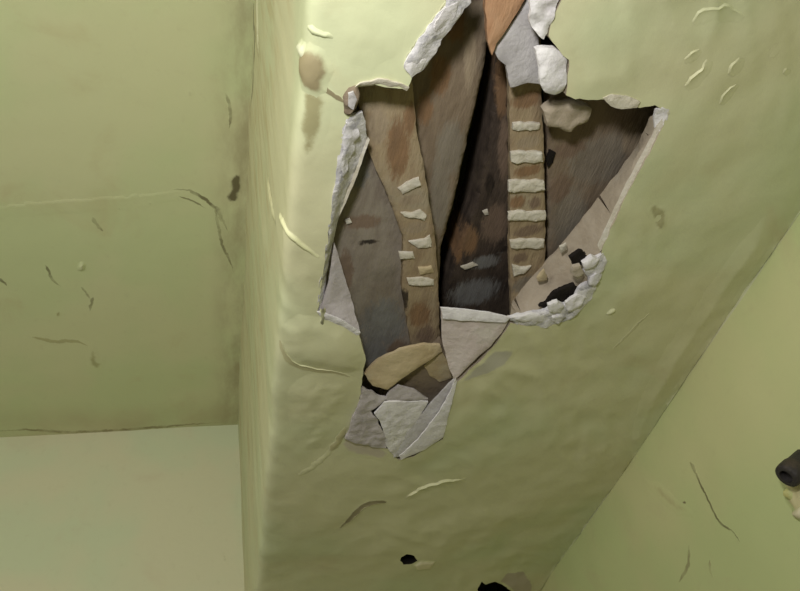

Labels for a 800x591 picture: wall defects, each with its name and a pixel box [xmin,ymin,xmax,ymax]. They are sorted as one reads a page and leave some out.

crack [225,0,259,128]
peeling [296,38,306,57]
spalling [528,0,569,95]
spalling [603,94,640,109]
spalling [317,0,471,311]
crack [45,265,61,287]
crack [174,188,234,272]
spalling [452,107,670,382]
peeling [339,500,387,528]
crack [689,462,740,542]